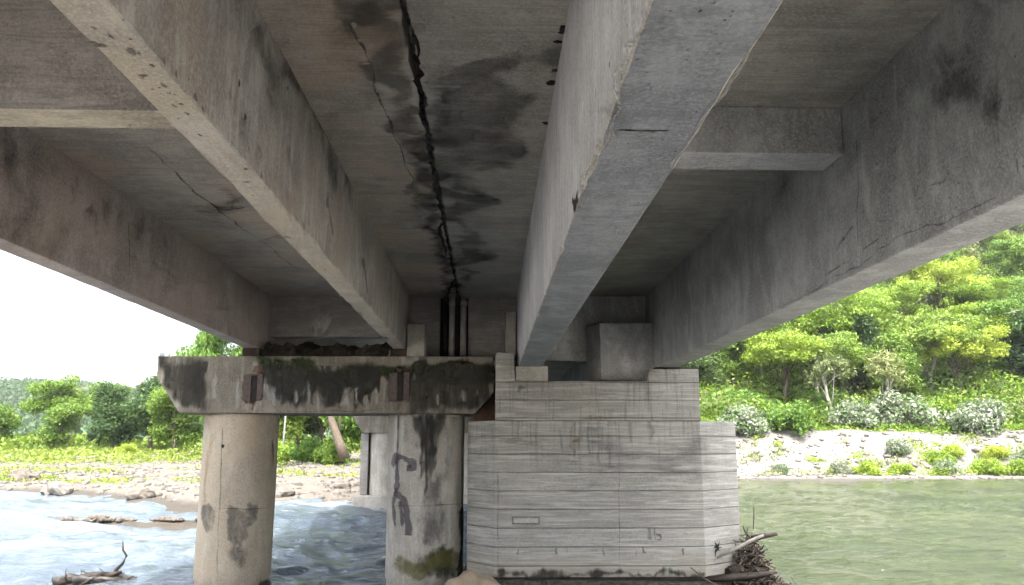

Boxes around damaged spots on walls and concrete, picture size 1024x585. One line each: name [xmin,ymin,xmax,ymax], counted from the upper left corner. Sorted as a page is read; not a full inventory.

crack [399,0,458,296]
leakage [159,352,216,410]
leakage [263,364,381,409]
leakage [405,359,492,498]
leakage [227,504,257,565]
leakage [424,515,443,544]